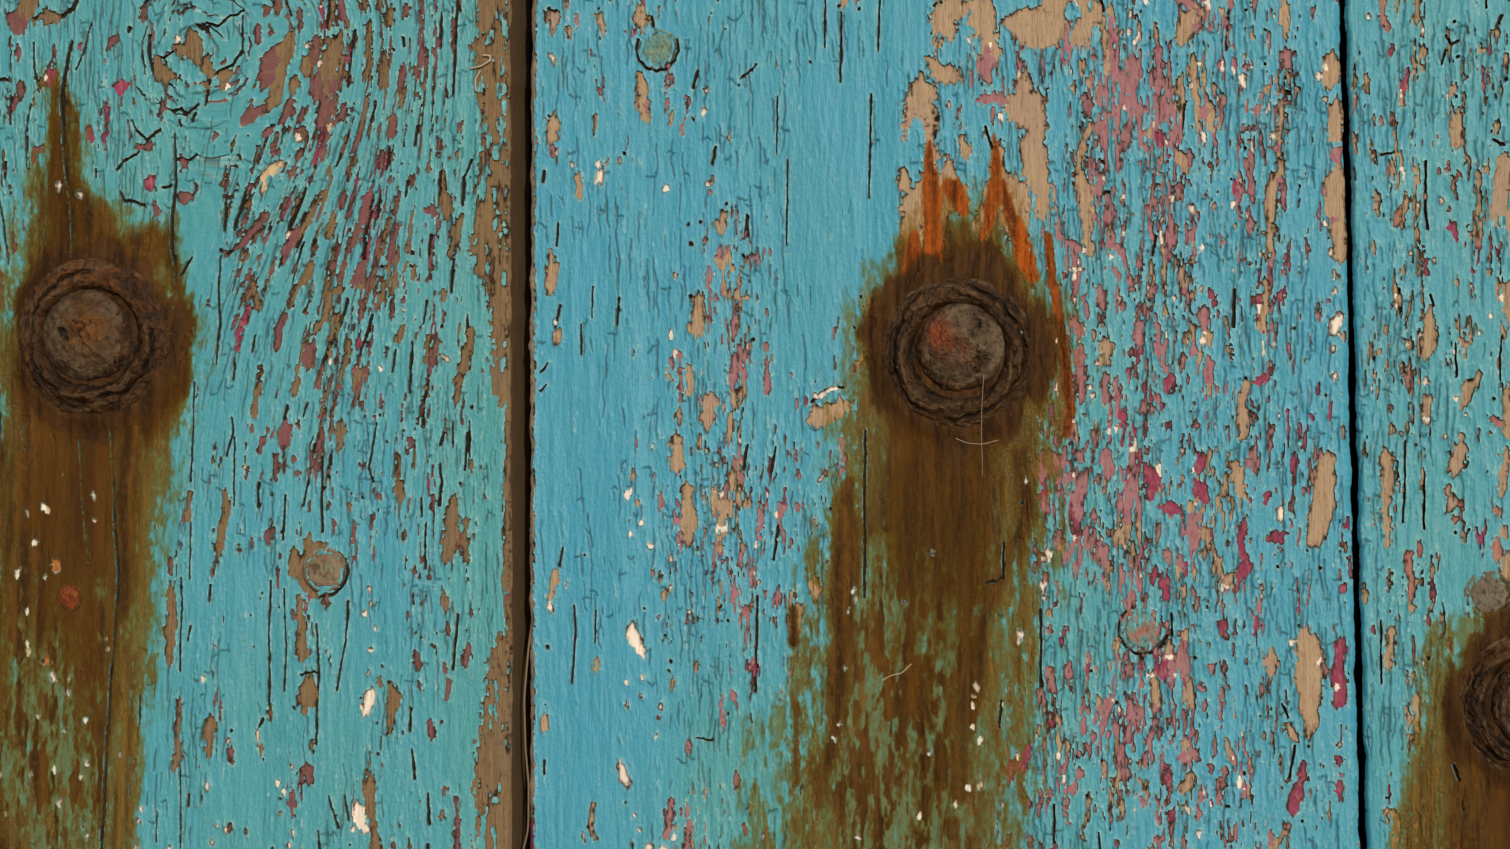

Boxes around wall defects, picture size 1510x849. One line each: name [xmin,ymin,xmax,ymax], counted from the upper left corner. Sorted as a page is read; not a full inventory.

crack [0,0,93,257]
rust [0,115,193,849]
crack [101,429,142,849]
crack [117,0,486,849]
peeling [0,0,660,849]
peeling [634,64,709,136]
rust [789,135,1074,849]
peeling [895,0,1510,849]
rust [1402,593,1510,849]